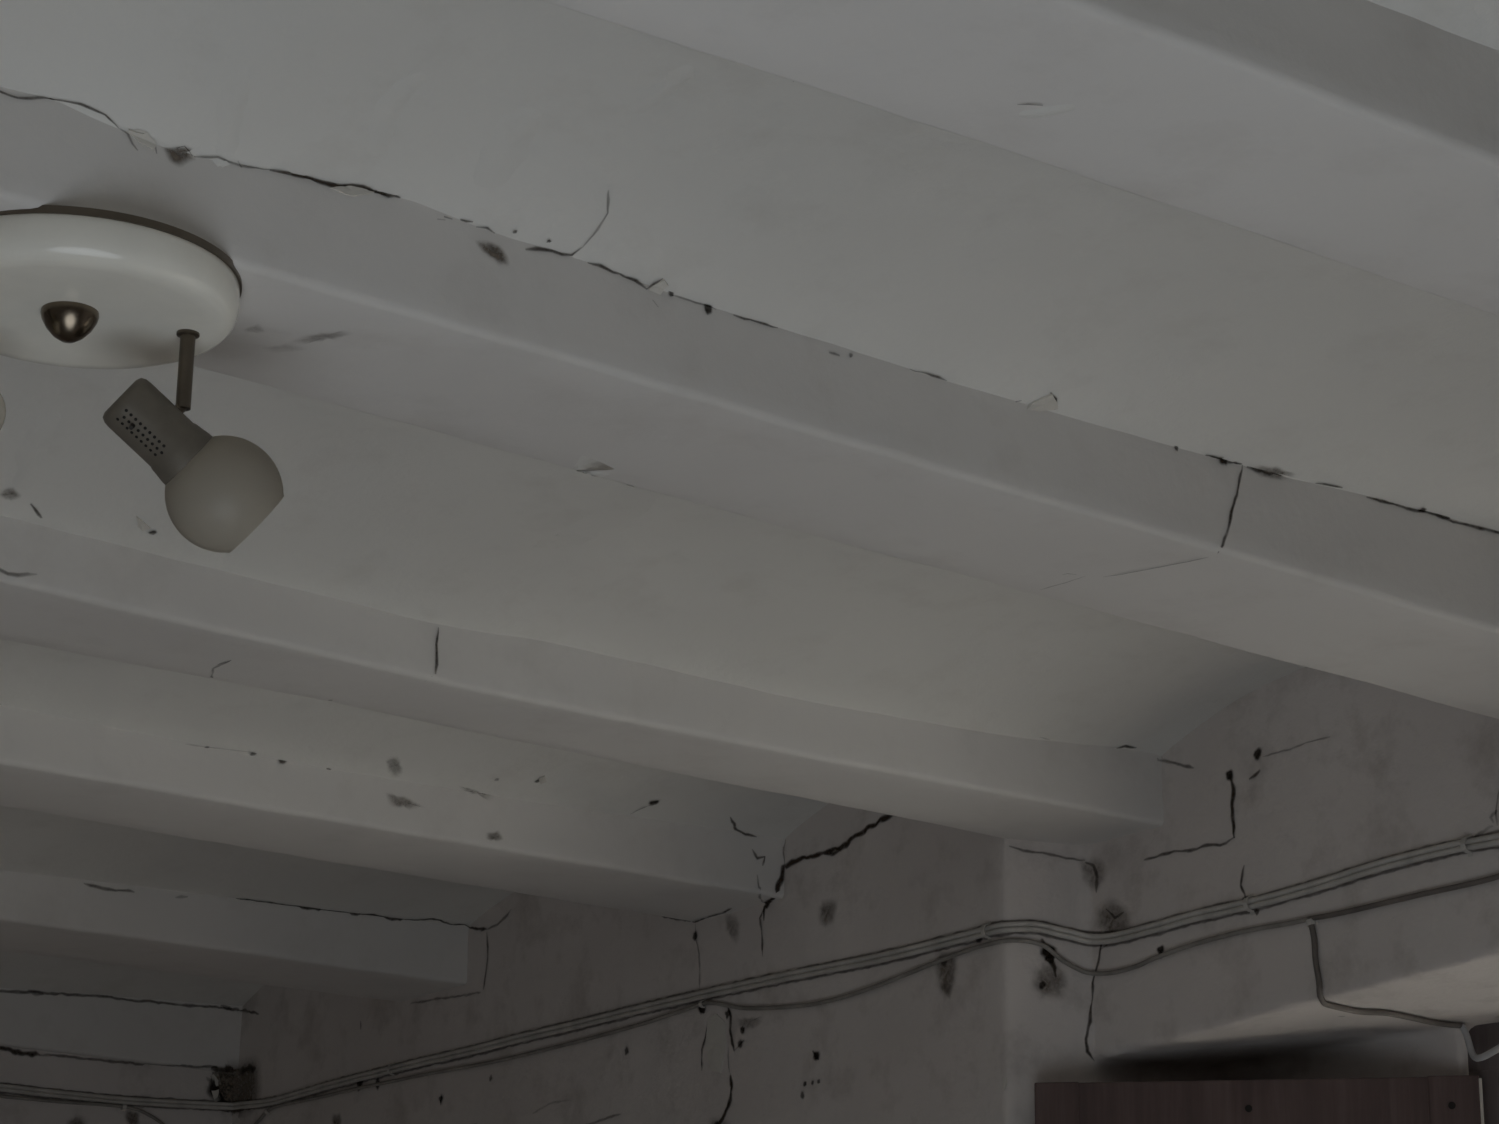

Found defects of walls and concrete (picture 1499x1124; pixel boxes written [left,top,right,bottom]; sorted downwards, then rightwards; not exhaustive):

crack [0,91,116,125]
crack [202,157,401,198]
crack [444,216,776,328]
crack [3,491,40,516]
crack [1120,455,1243,575]
crack [1368,497,1499,534]
crack [433,627,441,674]
crack [1148,749,1261,915]
crack [662,815,892,951]
crack [0,990,257,1014]
crack [715,1008,747,1124]